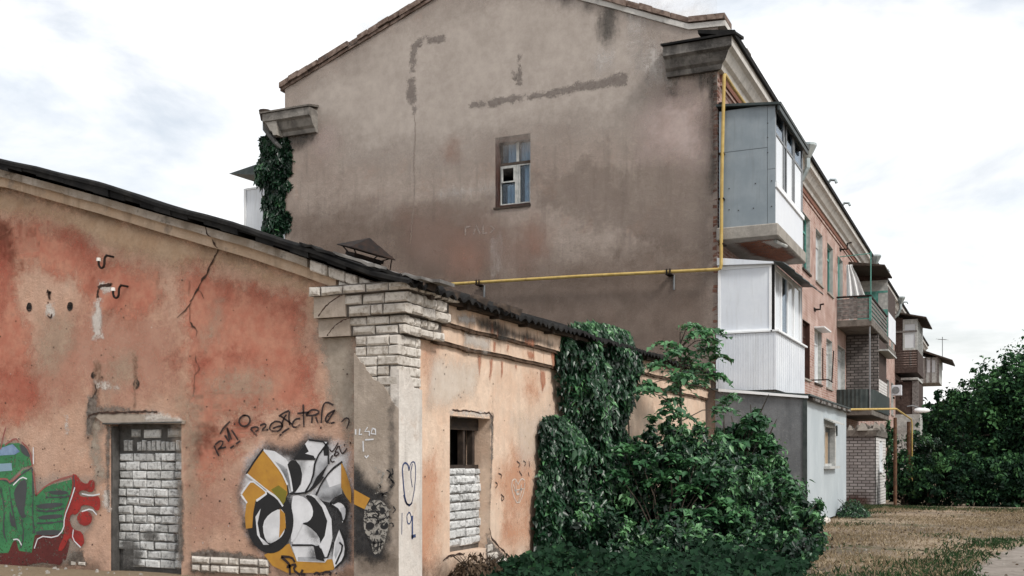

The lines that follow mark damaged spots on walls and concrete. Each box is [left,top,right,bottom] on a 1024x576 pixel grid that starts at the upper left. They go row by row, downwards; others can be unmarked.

crack [177,227,218,394]
peeling [0,191,505,575]